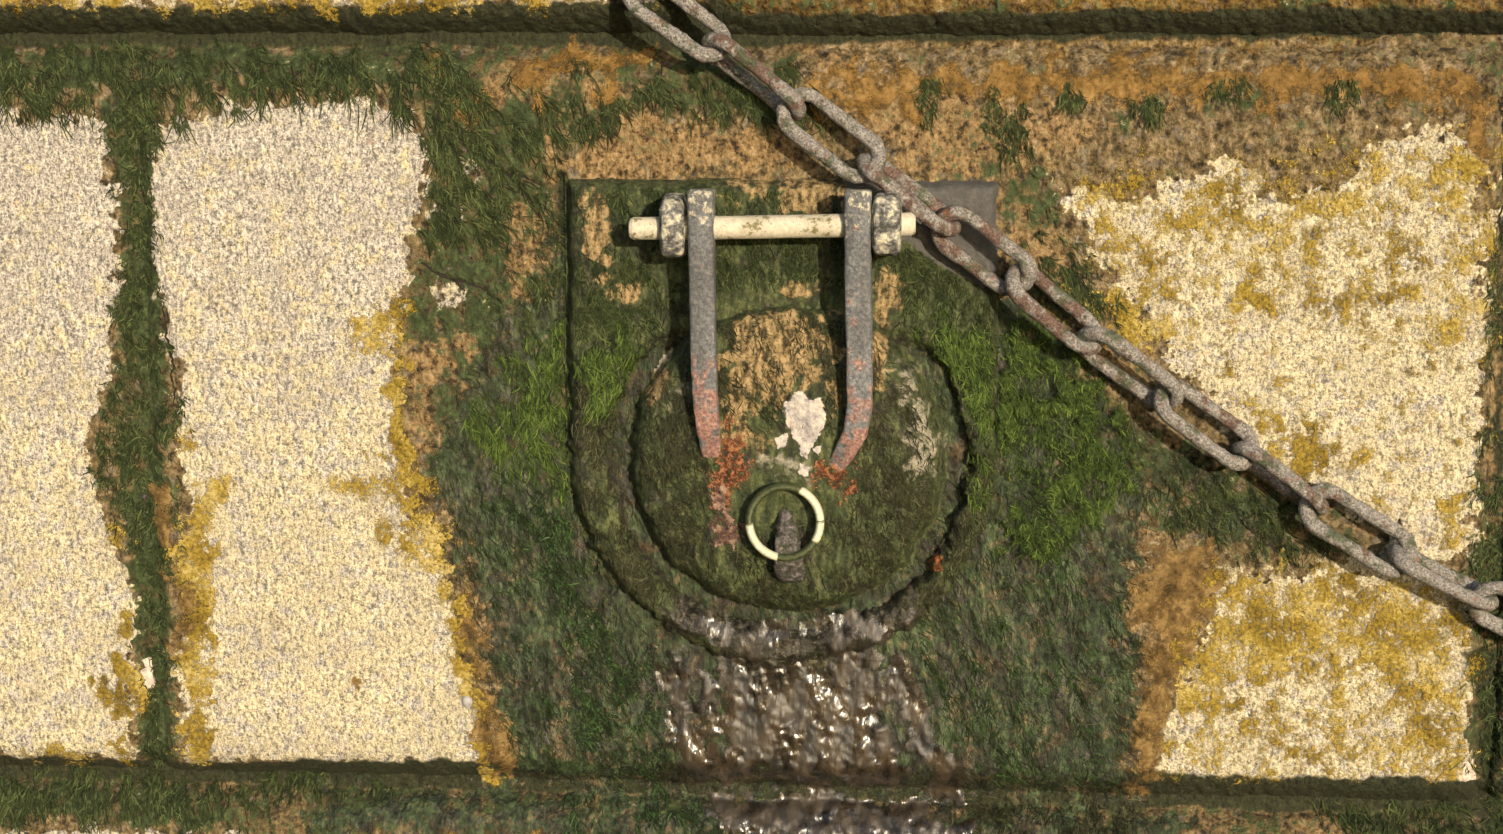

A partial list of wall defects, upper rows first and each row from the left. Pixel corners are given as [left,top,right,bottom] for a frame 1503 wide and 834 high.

corrosion [693,413,754,551]
corrosion [808,459,858,507]
leakage [630,643,985,834]